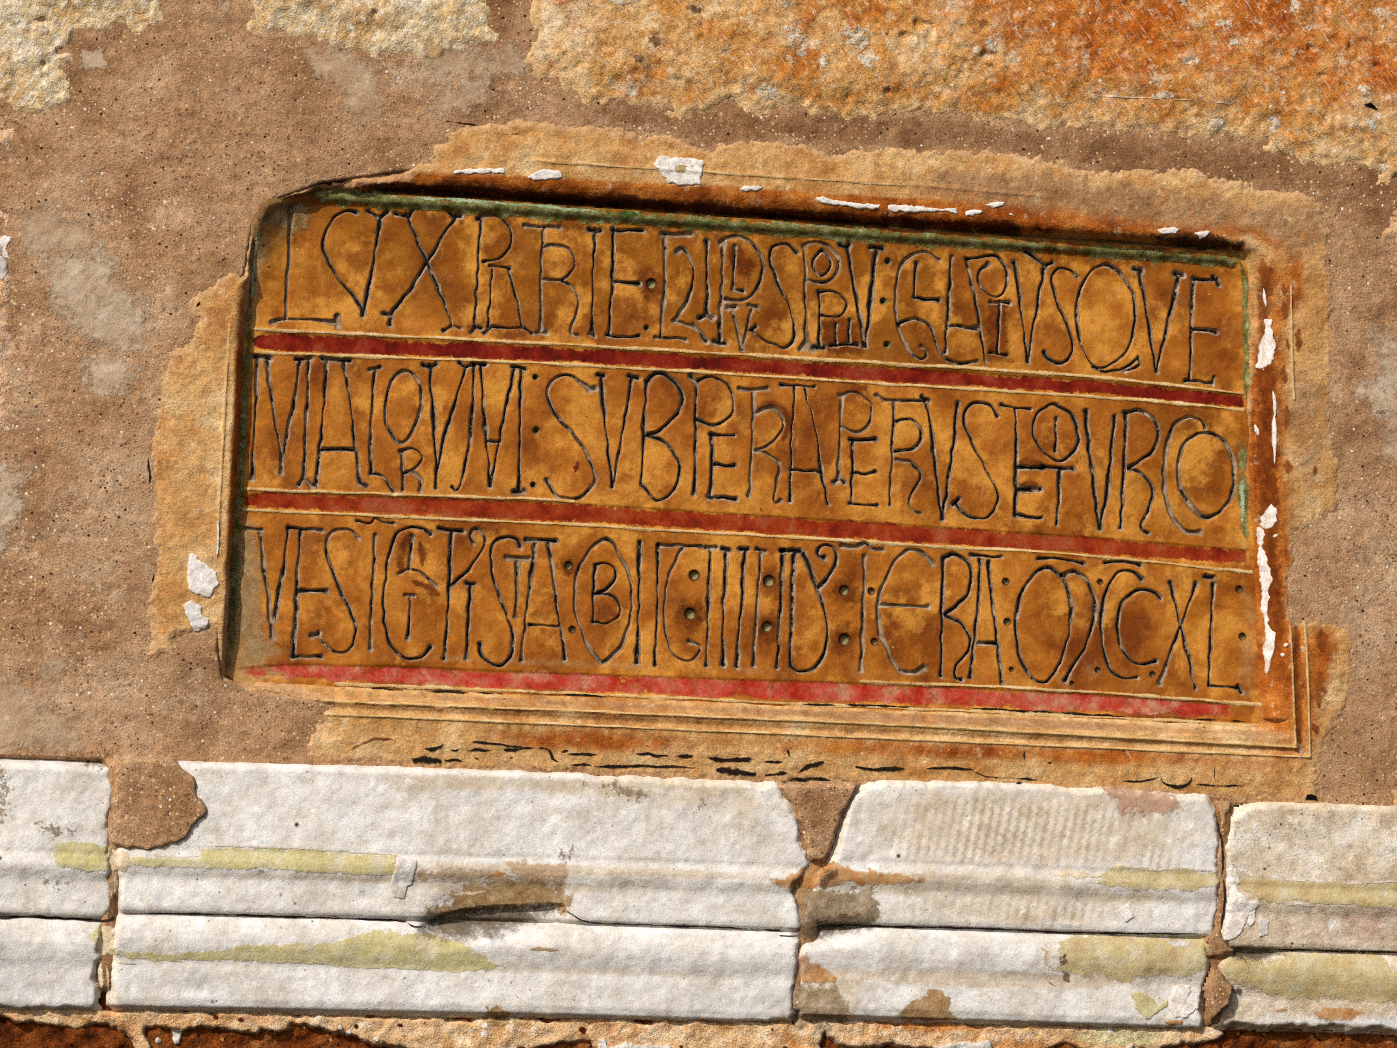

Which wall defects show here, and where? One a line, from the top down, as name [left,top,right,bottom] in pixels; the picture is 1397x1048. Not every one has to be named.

spalling [653,155,705,186]
peeling [816,196,1014,217]
peeling [1157,227,1210,239]
peeling [1255,288,1276,370]
peeling [1254,392,1277,463]
peeling [183,520,220,632]
peeling [1256,504,1289,674]
crack [345,737,1050,784]
crack [1124,767,1241,790]
crack [557,909,824,937]
spalling [770,861,934,928]
crack [862,821,1226,935]